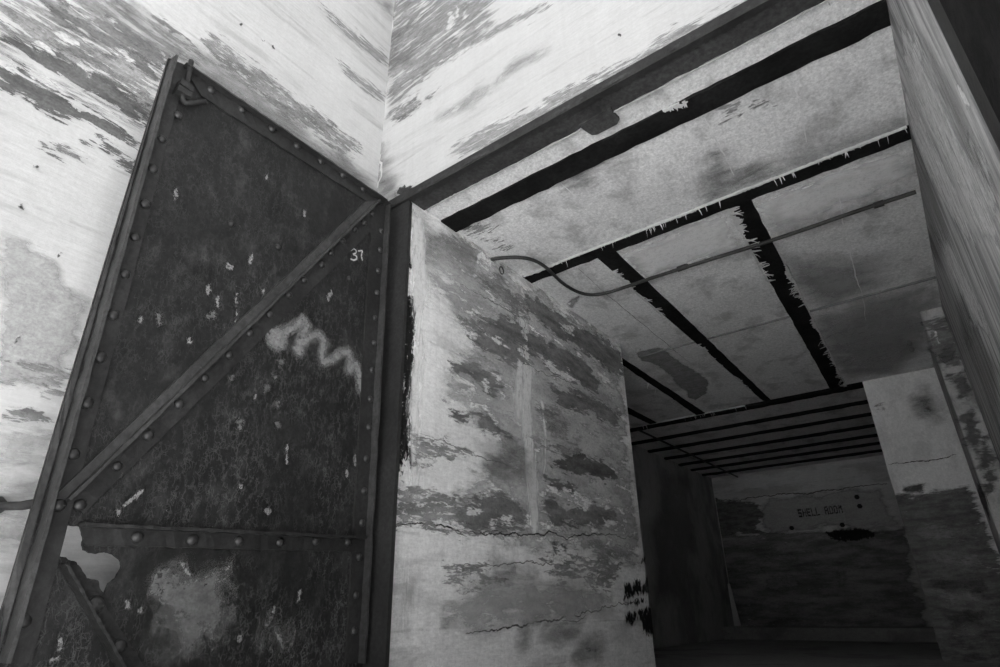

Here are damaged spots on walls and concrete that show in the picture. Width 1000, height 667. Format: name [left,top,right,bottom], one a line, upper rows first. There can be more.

peeling [0,0,363,174]
peeling [391,90,437,122]
water stain [487,26,997,534]
peeling [396,223,638,597]
crack [398,522,639,571]
crack [466,598,637,634]